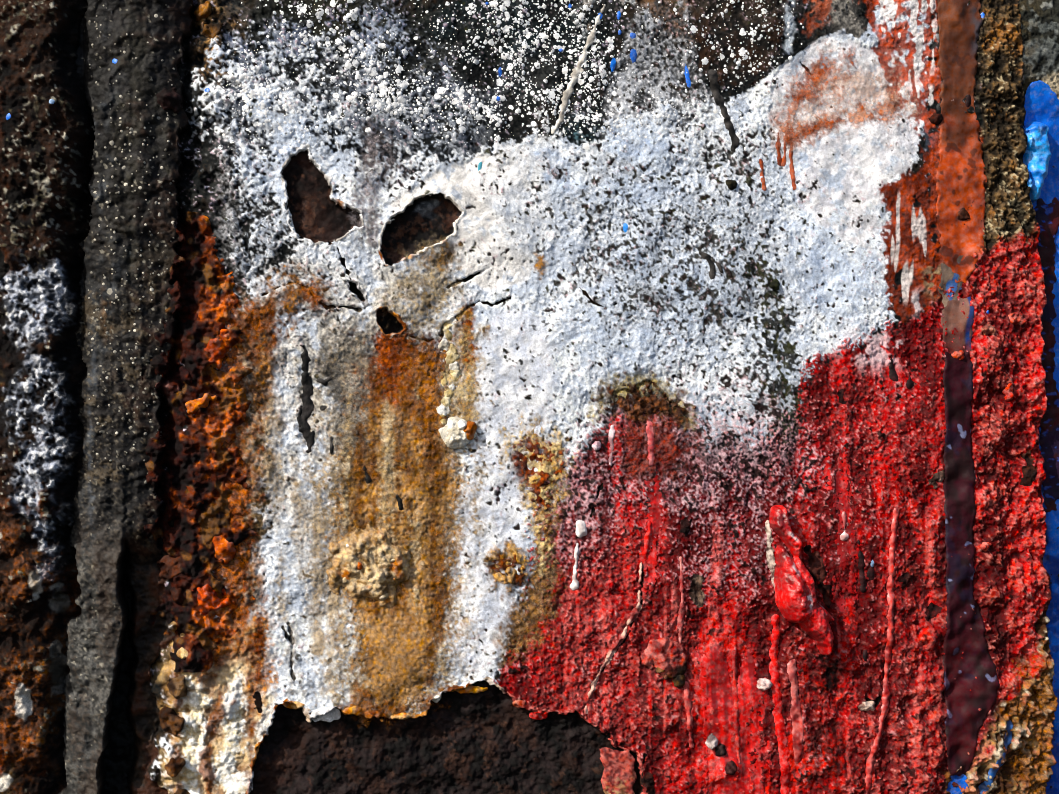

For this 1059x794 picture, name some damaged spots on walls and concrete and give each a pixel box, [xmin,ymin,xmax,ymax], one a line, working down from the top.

corrosion [194,1,223,39]
peeling [280,143,364,247]
peeling [378,193,466,266]
corrosion [142,212,567,737]
corrosion [164,751,189,794]
peeling [245,676,655,794]